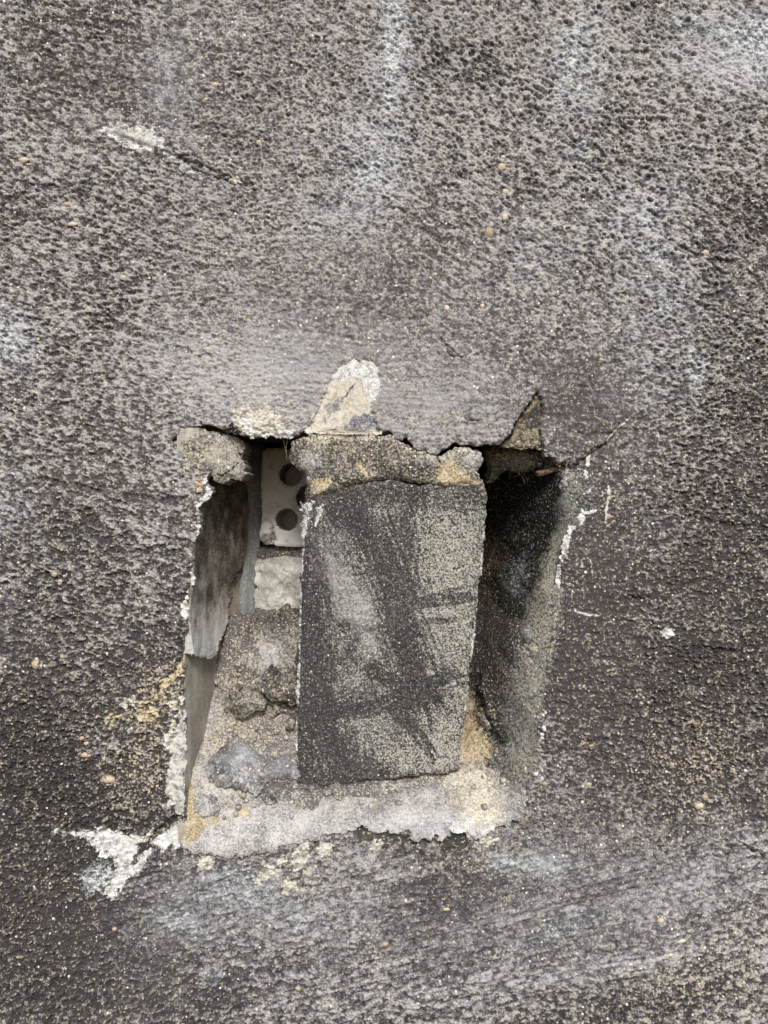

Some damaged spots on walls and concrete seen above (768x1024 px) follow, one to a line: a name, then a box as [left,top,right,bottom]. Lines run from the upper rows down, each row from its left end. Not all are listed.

crack [187,163,229,181]
spalling [232,355,383,439]
spalling [500,392,544,450]
crack [499,391,630,467]
spalling [555,508,597,588]
flaking render [179,476,324,704]
spalling [196,856,215,872]
spalling [254,841,334,896]
spalling [352,826,415,851]
spalling [439,816,500,852]